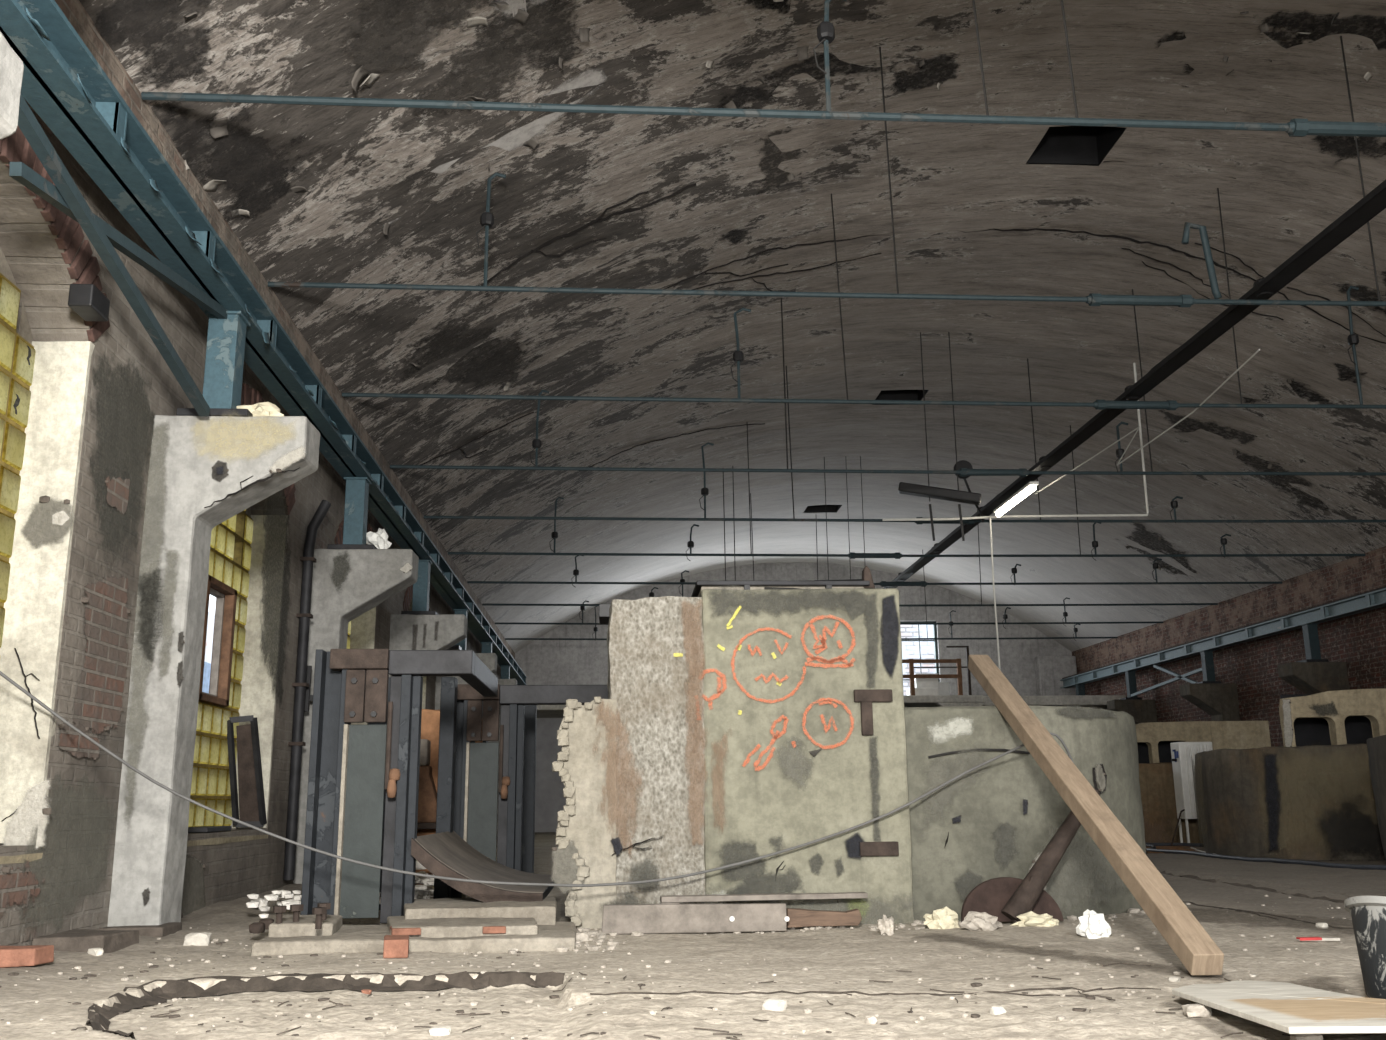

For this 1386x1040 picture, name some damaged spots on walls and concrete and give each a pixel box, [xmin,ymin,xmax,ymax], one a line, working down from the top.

crack [481,183,696,286]
crack [665,235,882,292]
crack [961,228,1386,344]
spalling [552,841,586,893]
spalling [611,838,623,856]
crack [1183,901,1353,929]